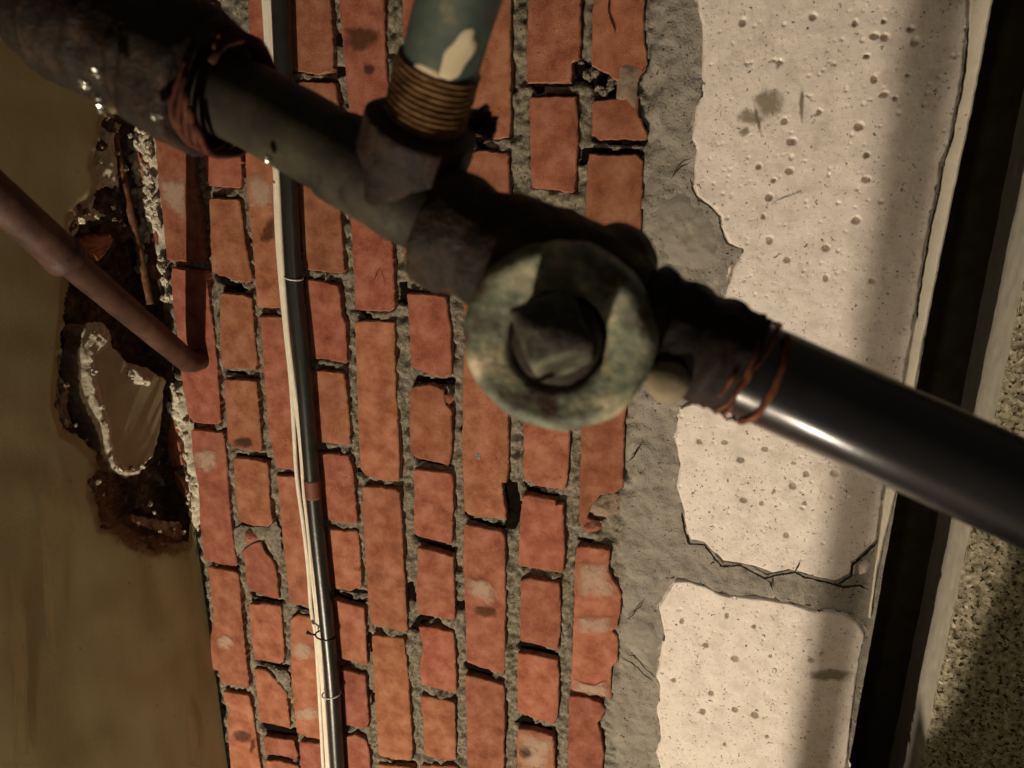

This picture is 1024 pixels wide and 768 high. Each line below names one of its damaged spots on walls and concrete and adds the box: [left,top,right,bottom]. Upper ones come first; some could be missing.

peeling [413,29,477,81]
spalling [575,58,617,96]
leakage [739,92,778,136]
spalling [69,114,173,328]
spalling [54,280,200,551]
spalling [504,479,522,529]
spalling [583,492,621,533]
spalling [233,522,282,560]
crack [681,513,877,591]
spalling [272,668,291,689]